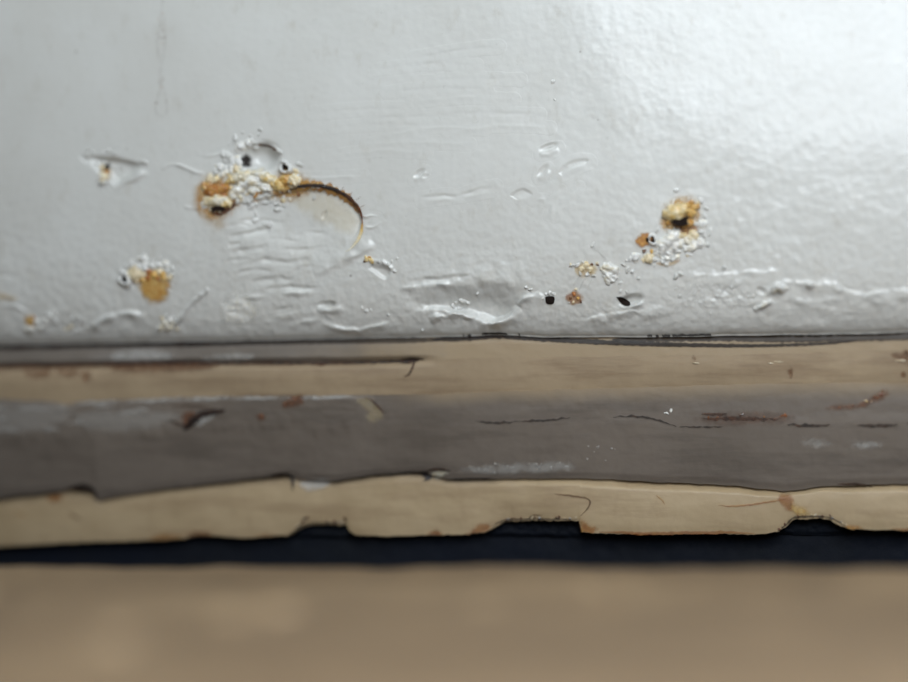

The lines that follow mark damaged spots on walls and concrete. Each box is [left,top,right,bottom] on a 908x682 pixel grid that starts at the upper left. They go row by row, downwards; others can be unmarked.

corrosion [566,288,582,304]
peeling [289,516,360,538]
peeling [487,515,594,537]
peeling [777,514,859,536]